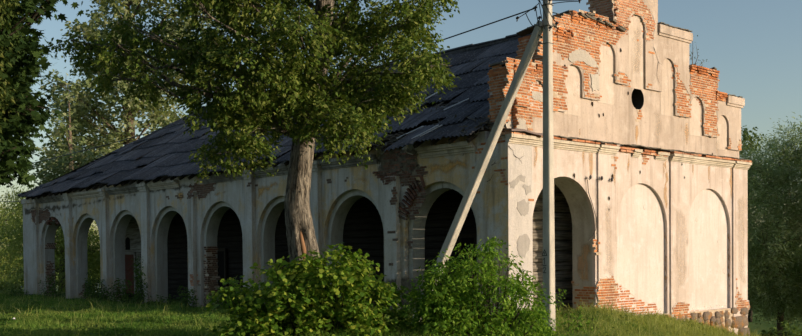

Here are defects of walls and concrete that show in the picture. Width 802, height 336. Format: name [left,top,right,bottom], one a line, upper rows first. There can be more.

flaking render [475,0,656,216]
flaking render [671,63,742,150]
flaking render [166,183,218,202]
flaking render [372,147,475,205]
flaking render [189,246,221,307]
flaking render [571,275,658,315]
flaking render [672,301,697,319]